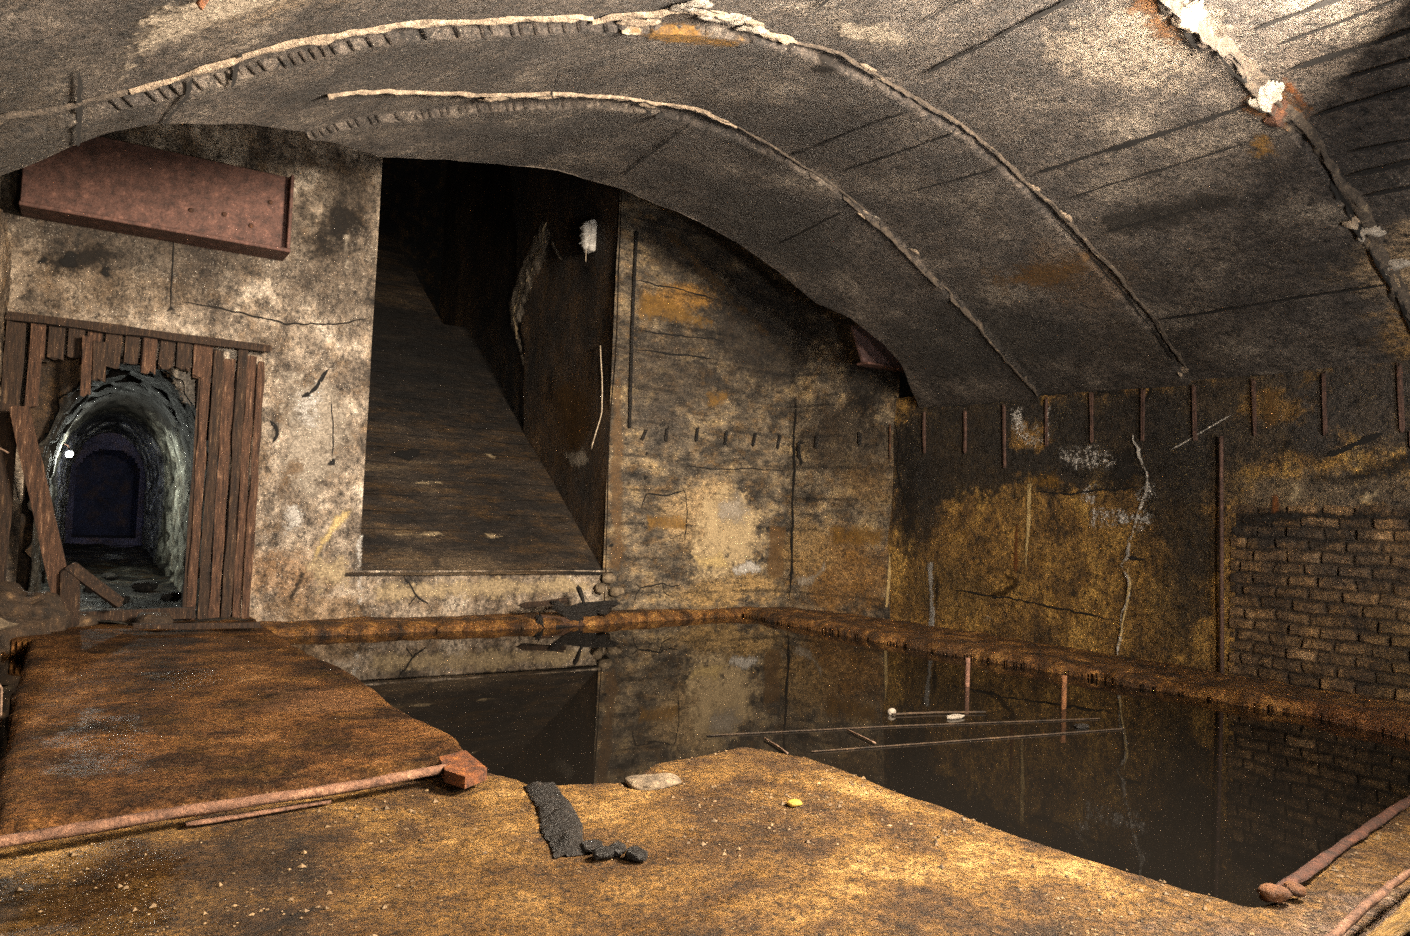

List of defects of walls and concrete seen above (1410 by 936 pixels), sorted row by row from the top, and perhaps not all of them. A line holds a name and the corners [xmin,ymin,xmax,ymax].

peeling [1157,0,1234,52]
peeling [1246,80,1288,128]
peeling [1341,214,1387,242]